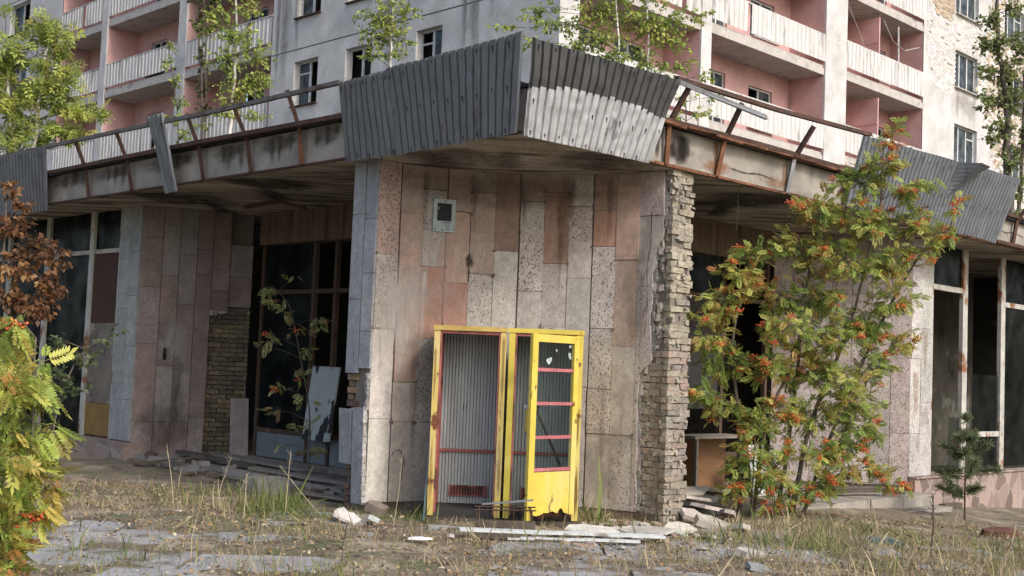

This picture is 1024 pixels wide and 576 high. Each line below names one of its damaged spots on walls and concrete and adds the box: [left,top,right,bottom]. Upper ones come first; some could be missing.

water stain [656,135,690,161]
water stain [229,179,304,199]
spalling [202,310,250,454]